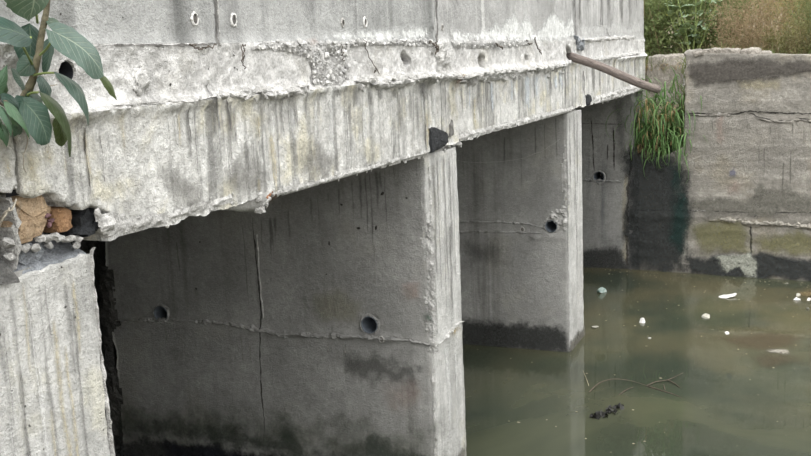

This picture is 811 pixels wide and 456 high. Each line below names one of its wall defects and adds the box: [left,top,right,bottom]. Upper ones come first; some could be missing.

leakage [213,97,236,176]
crack [729,110,811,121]
spalling [94,192,234,238]
leakage [433,160,487,275]
leakage [583,149,811,282]
spalling [0,233,123,456]
crack [252,219,265,437]
leakage [113,409,254,456]